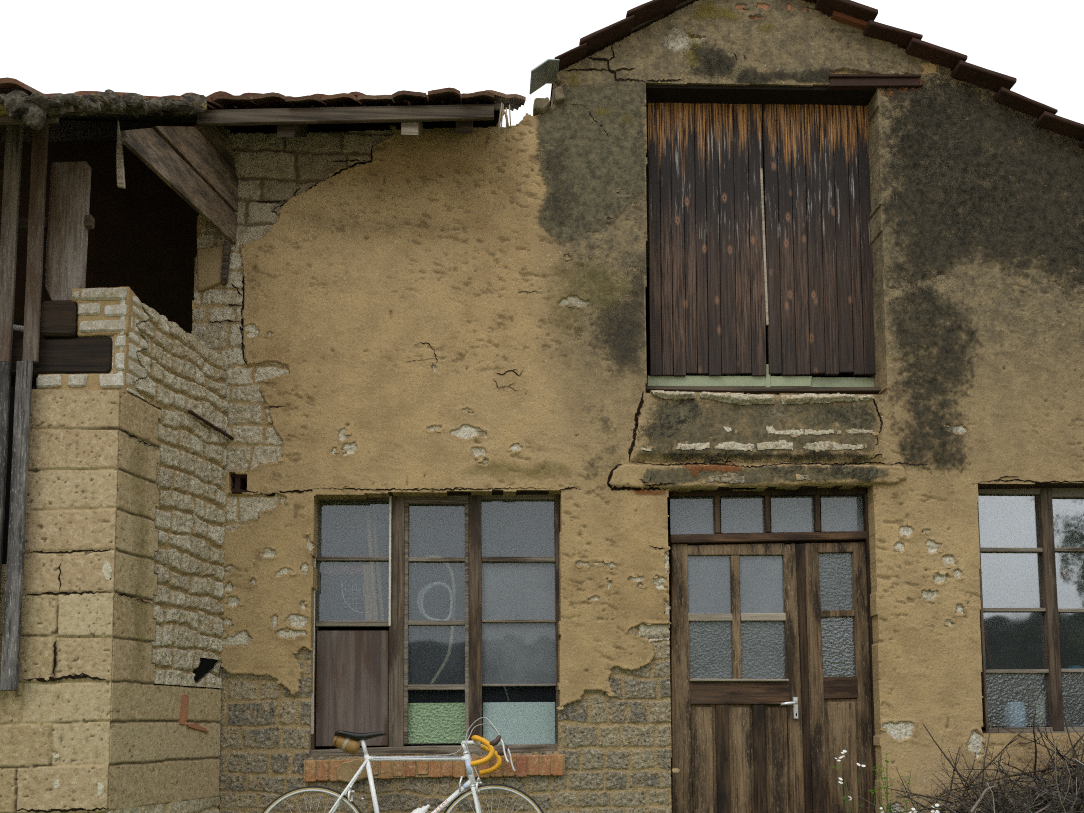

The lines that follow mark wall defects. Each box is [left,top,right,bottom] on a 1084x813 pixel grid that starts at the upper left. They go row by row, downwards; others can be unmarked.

crack [566,40,681,82]
flaking render [192,125,397,472]
damp [597,269,647,366]
mould [881,72,1084,470]
spalling [427,409,488,465]
crack [607,391,928,491]
crack [245,486,581,496]
spalling [894,526,965,600]
flaking render [193,546,680,813]